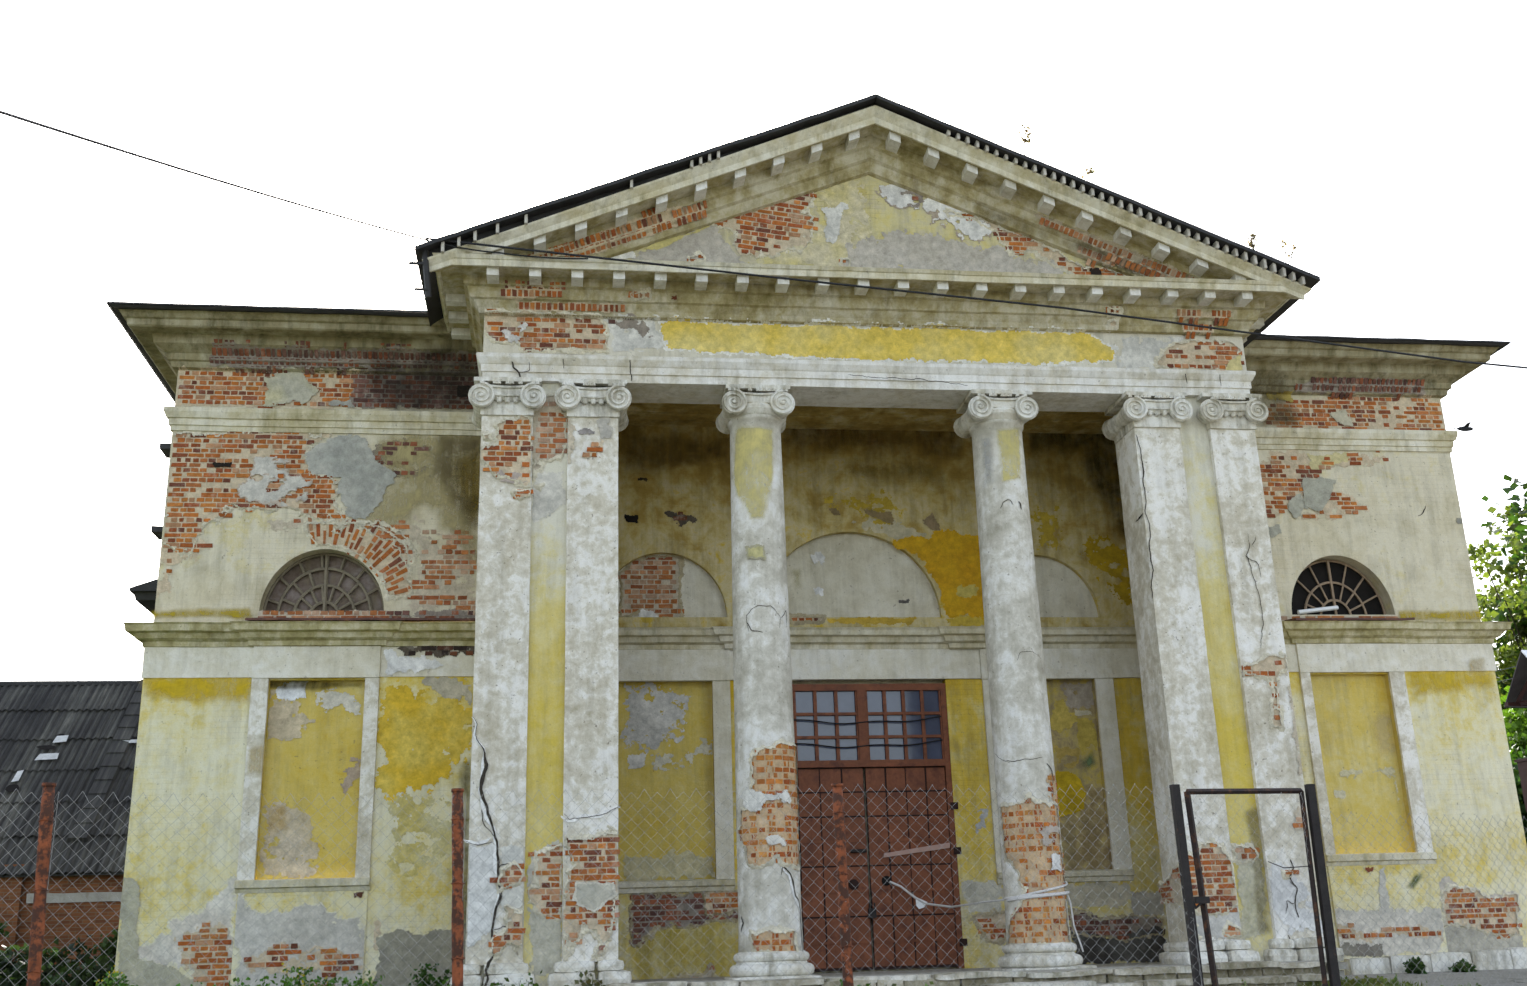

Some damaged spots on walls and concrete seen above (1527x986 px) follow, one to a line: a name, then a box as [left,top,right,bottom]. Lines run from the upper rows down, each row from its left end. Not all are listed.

flaking render [838,184,1194,278]
flaking render [156,431,477,618]
flaking render [481,393,613,523]
flaking render [175,280,1245,410]
flaking render [1260,450,1389,521]
flaking render [1263,376,1446,430]
peeling [137,876,365,986]
crack [465,717,509,986]
flaking render [488,825,799,962]
flaking render [738,738,801,872]
flaking render [960,773,1260,946]
flaking render [1281,858,1522,956]